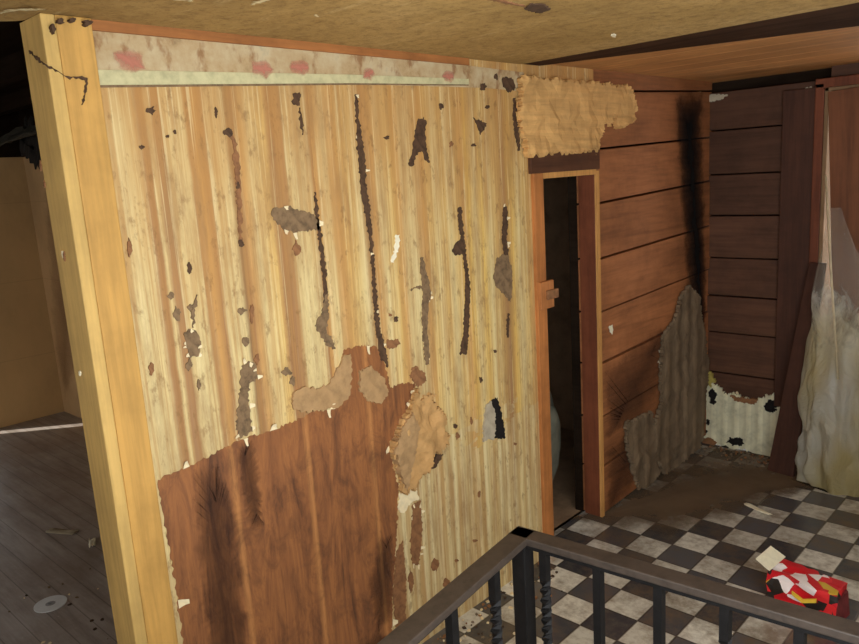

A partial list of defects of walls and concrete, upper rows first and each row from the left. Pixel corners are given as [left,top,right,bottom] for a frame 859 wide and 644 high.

crack [490,0,551,14]
crack [29,50,88,105]
peeling [515,75,638,158]
peeling [386,339,400,349]
peeling [281,367,295,386]
peeling [406,368,427,407]
peeling [623,285,780,490]